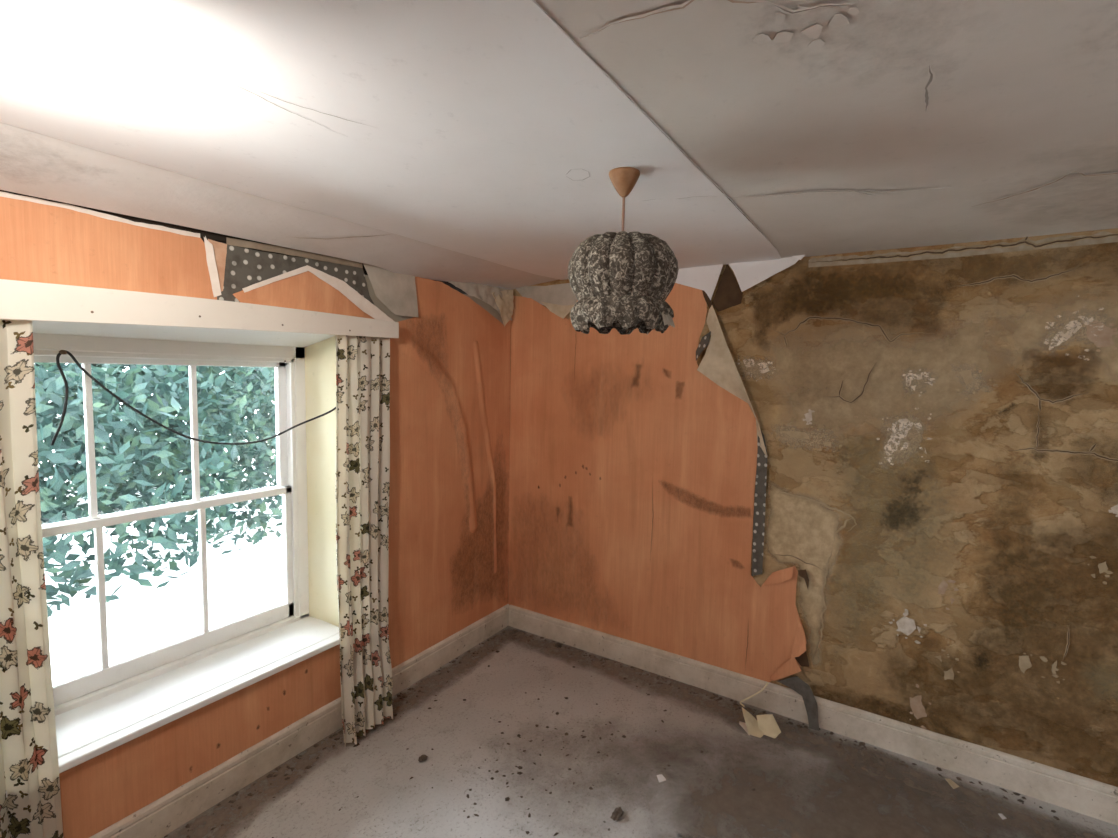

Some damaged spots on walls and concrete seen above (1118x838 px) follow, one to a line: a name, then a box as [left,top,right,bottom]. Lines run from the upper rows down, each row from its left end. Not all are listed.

crack [39,0,376,137]
crack [566,0,951,240]
crack [812,233,1118,263]
flaking render [1043,295,1118,361]
leakage [777,325,987,431]
flaking render [876,369,935,468]
leakage [768,486,841,663]
leakage [819,691,918,727]
flaking render [889,609,927,644]
flaking render [909,684,931,729]
leakage [899,536,1118,778]
flaking render [1019,653,1067,684]